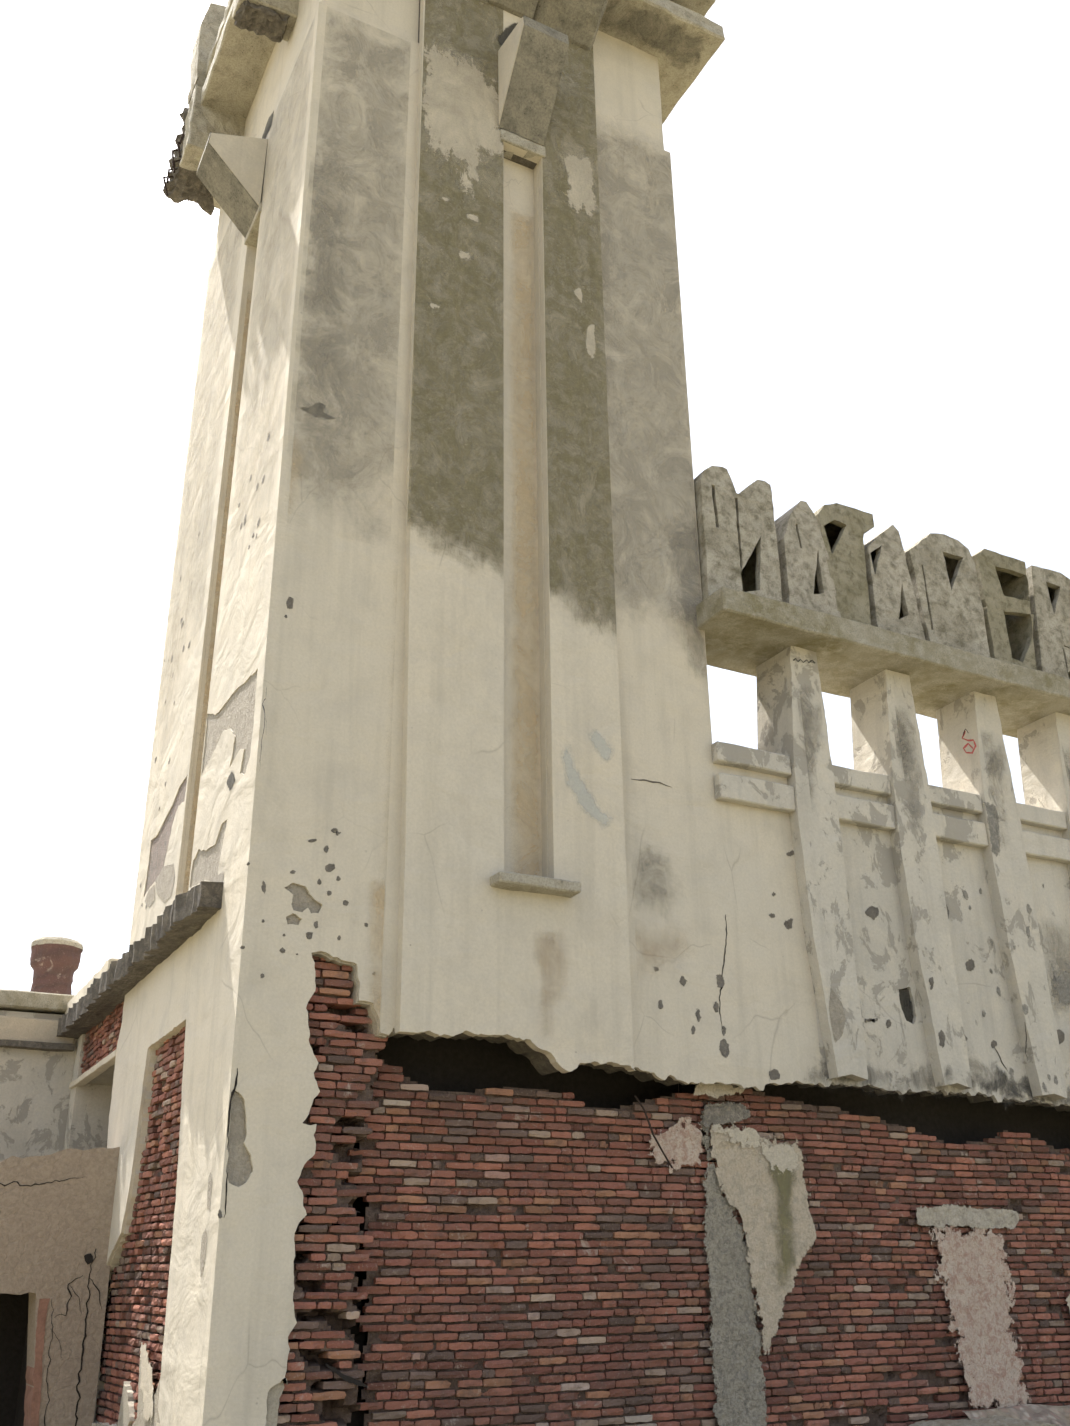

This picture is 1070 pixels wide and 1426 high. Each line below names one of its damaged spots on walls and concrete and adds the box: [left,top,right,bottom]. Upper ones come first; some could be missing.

spalling [163,107,215,216]
damp [308,34,402,482]
damp [597,139,700,586]
peeling [203,670,258,790]
peeling [140,778,227,907]
peeling [983,802,1001,856]
flaking render [80,1002,124,1076]
crack [0,1177,83,1187]
flaking render [96,1026,186,1426]
spalling [207,1092,252,1219]
flaking render [277,828,1070,1426]
crack [44,1249,102,1426]